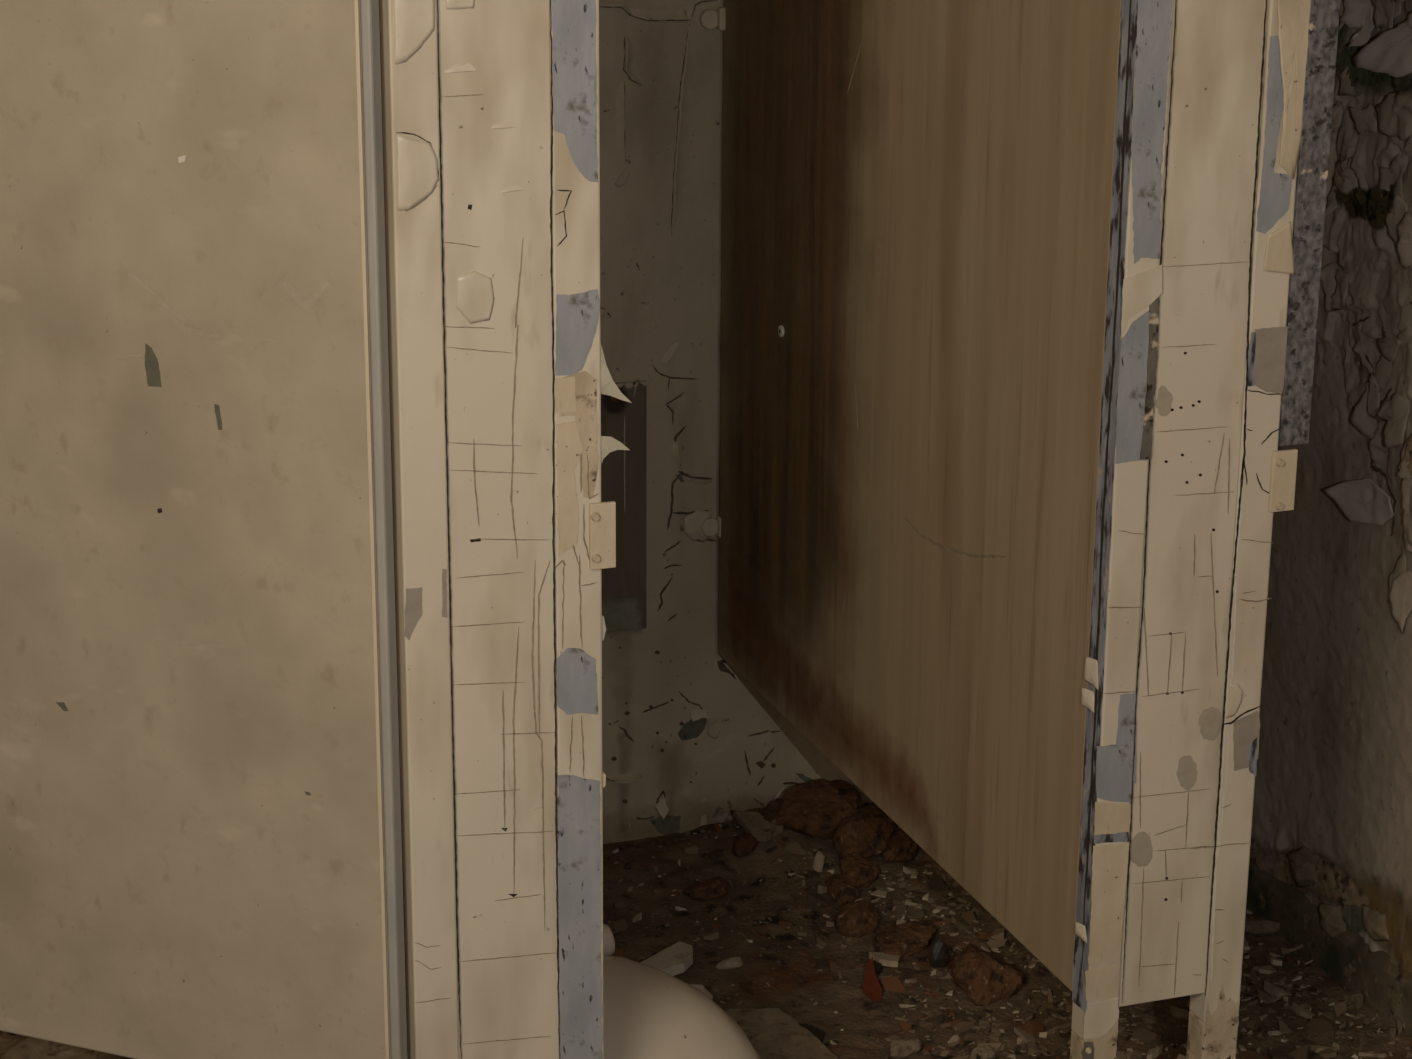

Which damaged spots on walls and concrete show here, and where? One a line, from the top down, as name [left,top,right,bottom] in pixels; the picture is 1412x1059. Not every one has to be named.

peeling [551,0,598,182]
crack [599,0,718,236]
peeling [1256,0,1311,275]
peeling [1331,0,1412,135]
damp [1336,24,1412,92]
peeling [1379,154,1412,268]
peeling [556,648,598,715]
peeling [555,289,632,556]
crack [653,366,716,622]
peeling [1323,478,1394,526]
peeling [1388,553,1412,633]
peeling [557,771,606,1059]